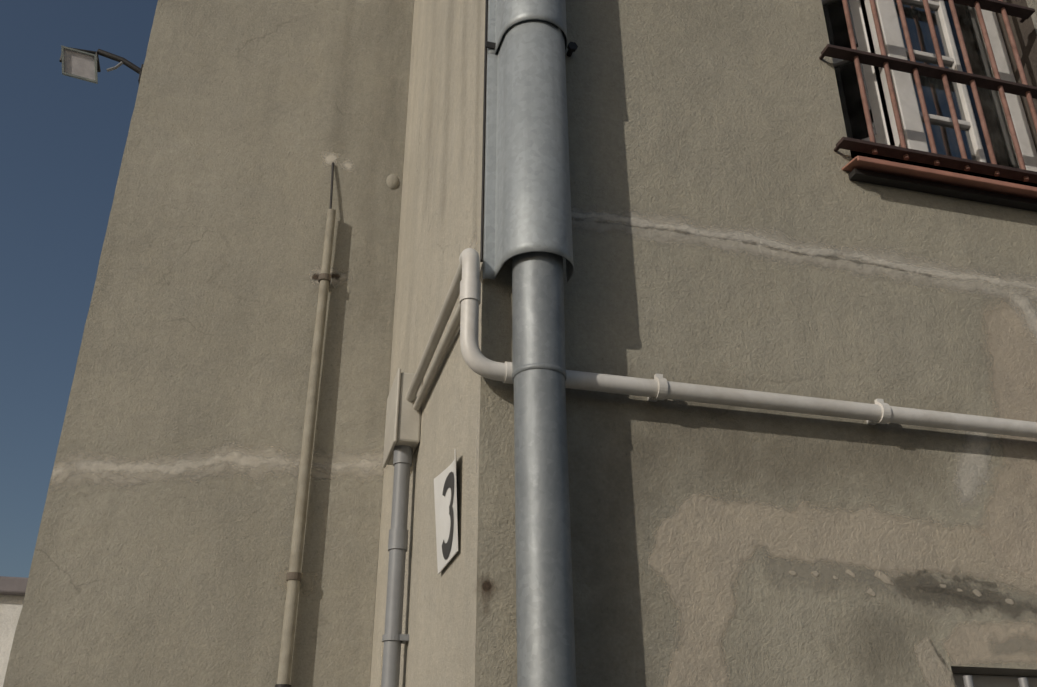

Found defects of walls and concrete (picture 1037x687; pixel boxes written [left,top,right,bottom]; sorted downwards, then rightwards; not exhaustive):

crack [1026,0,1037,32]
crack [571,208,1037,334]
crack [50,444,384,487]
flaking render [915,638,955,687]